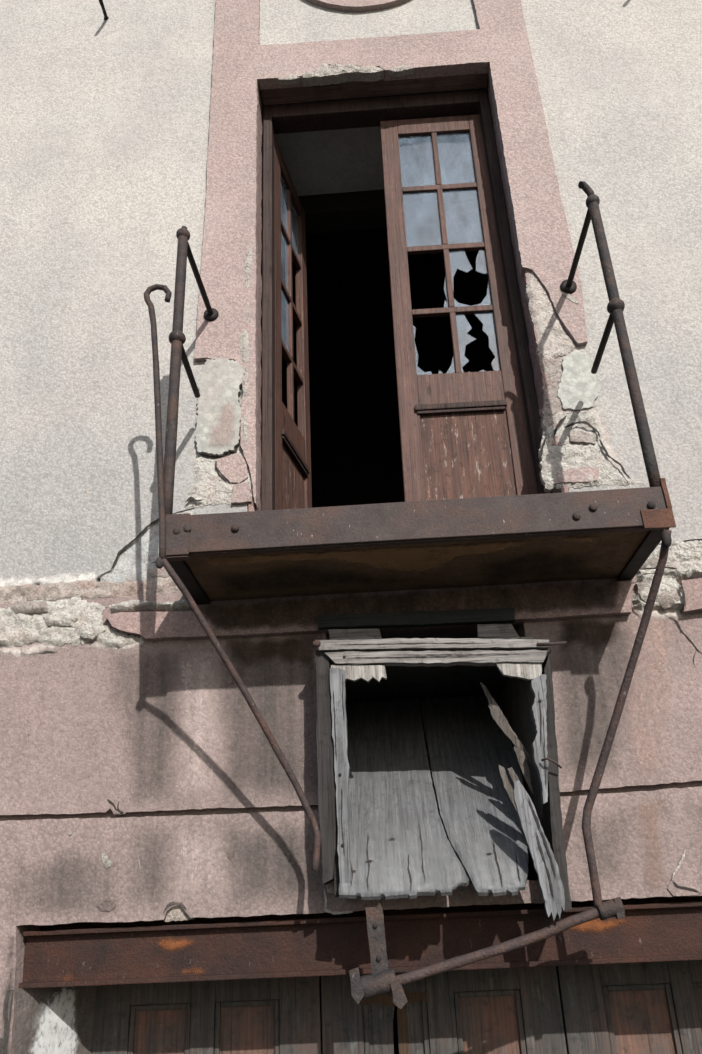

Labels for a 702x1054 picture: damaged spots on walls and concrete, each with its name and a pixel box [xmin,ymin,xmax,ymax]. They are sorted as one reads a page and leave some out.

flaking render [173,243,255,515]
spalling [524,271,644,493]
spalling [0,518,192,655]
spalling [632,540,702,618]
crack [666,615,701,666]
leakage [182,659,208,783]
corrosion [160,939,191,949]
corrosion [572,919,616,931]
peeling [31,988,77,1054]